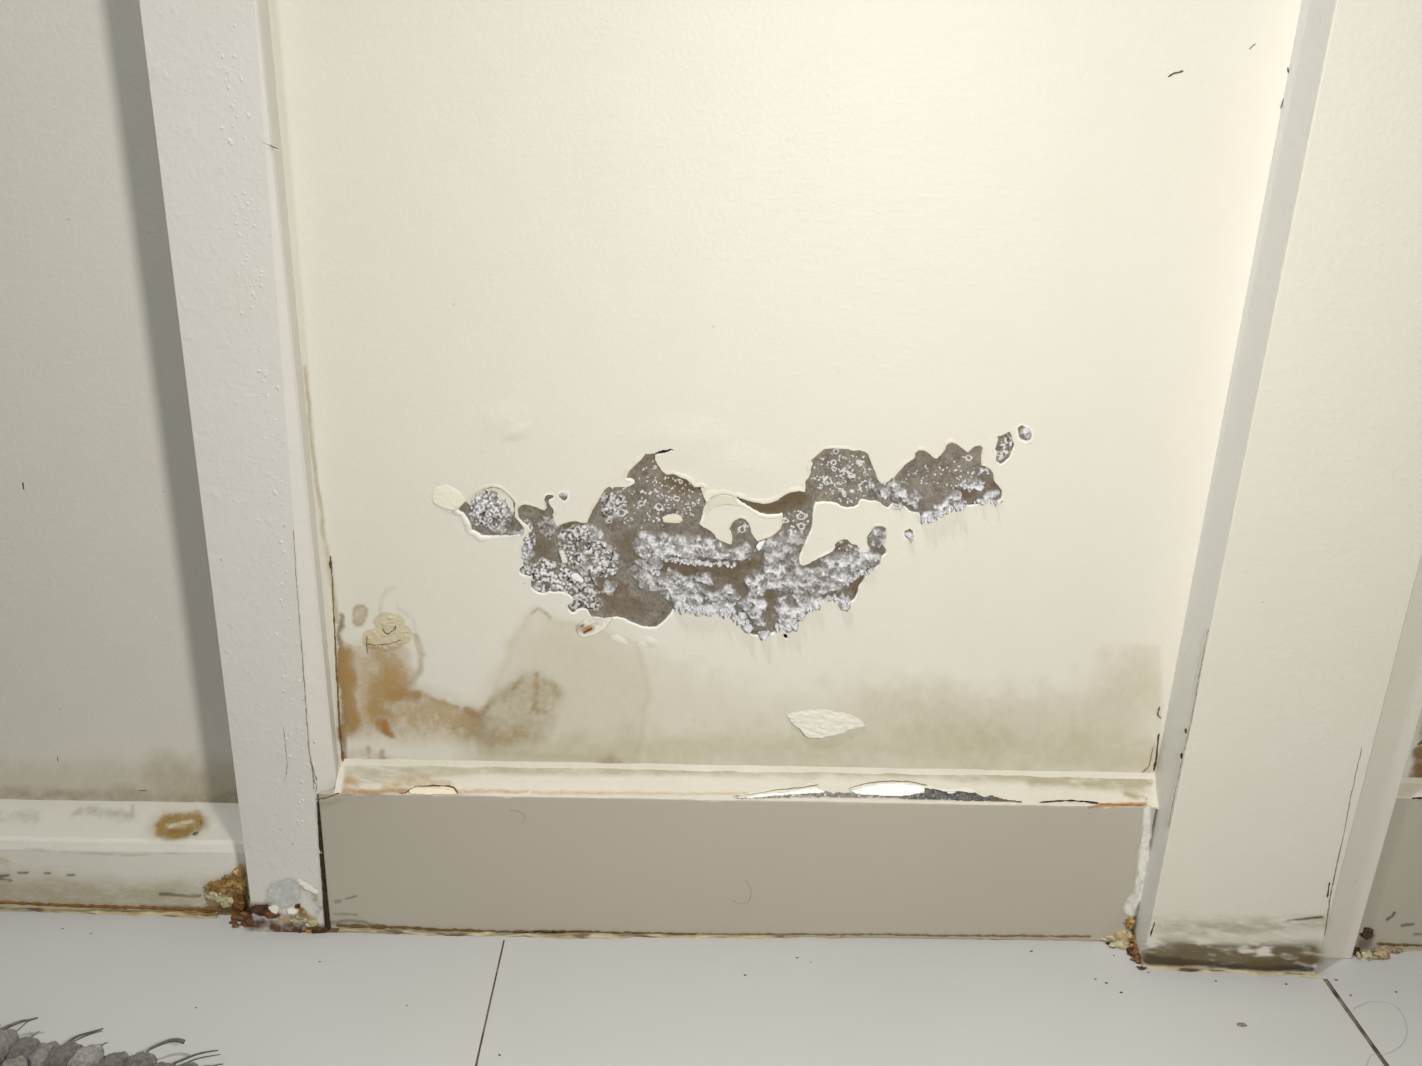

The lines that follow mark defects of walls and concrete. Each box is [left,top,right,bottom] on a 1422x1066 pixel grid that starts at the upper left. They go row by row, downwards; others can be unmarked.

peeling [432,425,1029,640]
peeling [787,709,865,738]
flaking render [737,780,1022,803]
water stain [993,775,1151,786]
corrosion [155,811,204,838]
corrosion [203,866,339,934]
corrosion [1100,916,1147,970]
water stain [1141,943,1322,971]